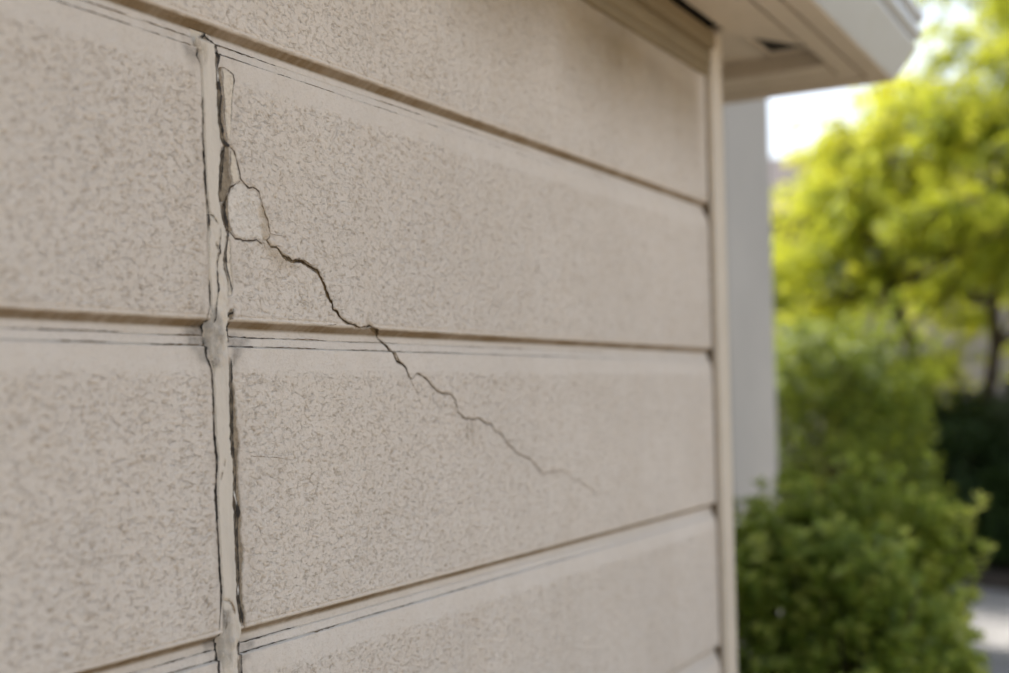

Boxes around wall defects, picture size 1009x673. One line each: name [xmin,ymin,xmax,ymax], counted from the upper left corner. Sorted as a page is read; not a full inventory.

crack [214,44,477,134]
crack [17,328,118,343]
crack [154,147,596,496]